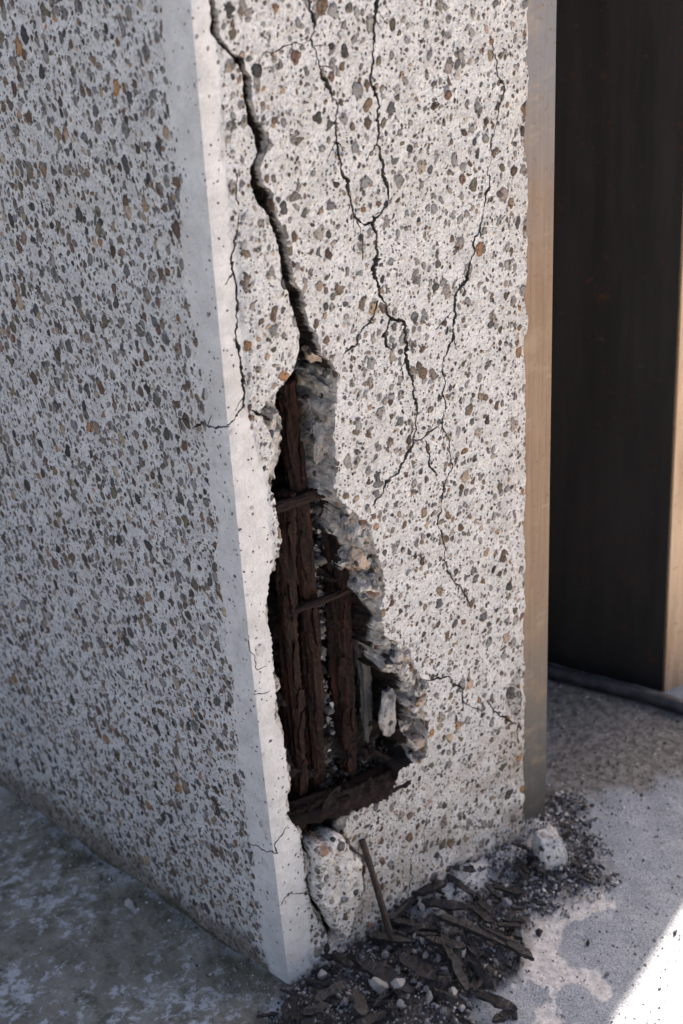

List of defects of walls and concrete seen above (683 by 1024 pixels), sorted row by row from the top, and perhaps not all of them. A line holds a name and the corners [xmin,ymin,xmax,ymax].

crack [176,0,505,610]
spalling [260,345,429,943]
crack [420,676,522,743]